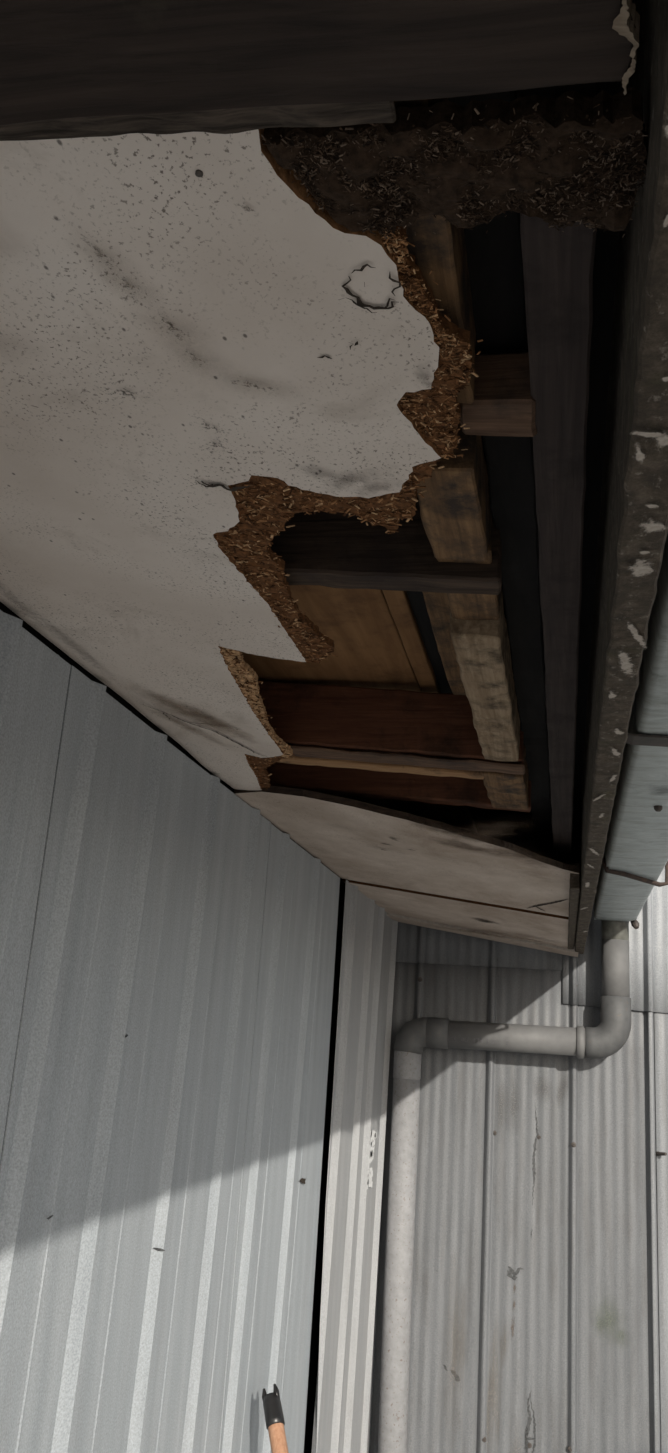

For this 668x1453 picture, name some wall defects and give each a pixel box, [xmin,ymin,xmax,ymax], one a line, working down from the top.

peeling [214,226,483,663]
peeling [220,647,294,789]
peeling [618,622,646,677]